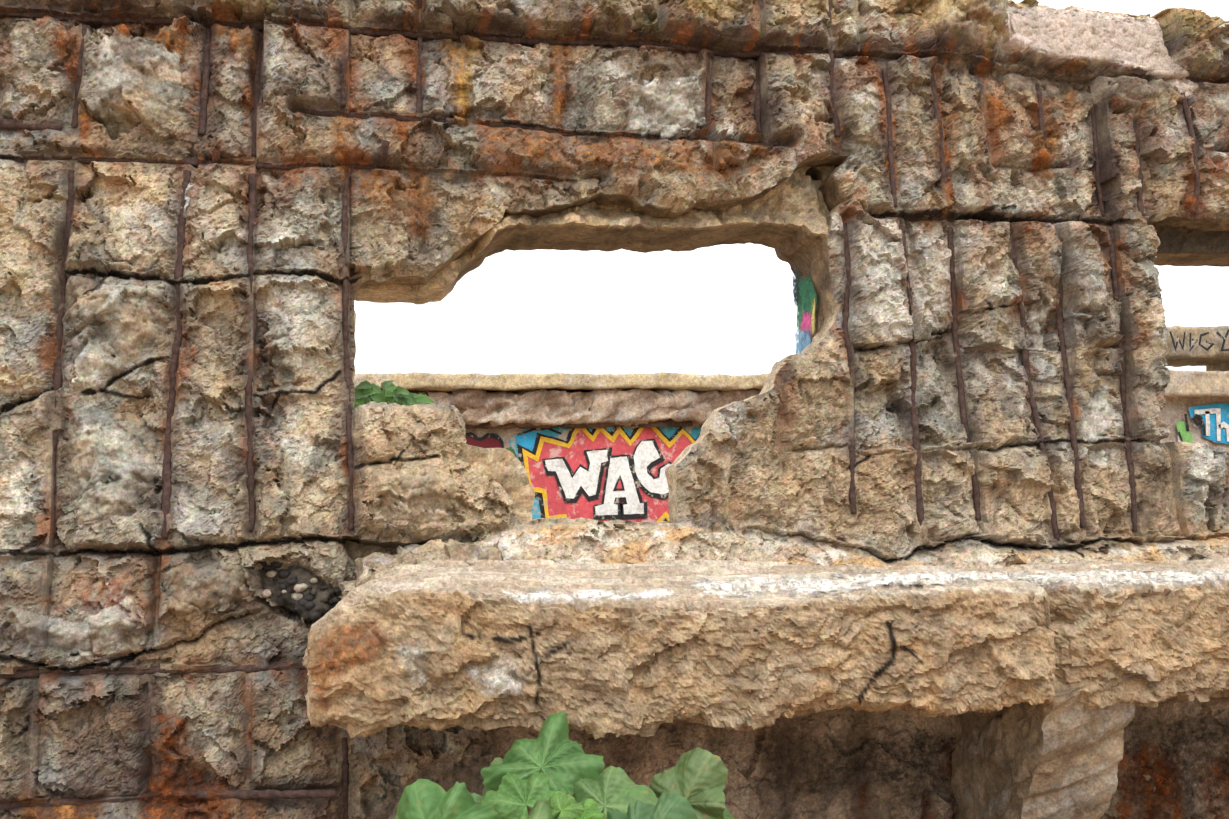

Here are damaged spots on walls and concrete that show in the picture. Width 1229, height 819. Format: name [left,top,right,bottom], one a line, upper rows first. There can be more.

rust [145,20,189,64]
rust [483,40,757,180]
spalling [874,68,897,218]
rust [1032,135,1058,179]
flaking render [899,13,1229,531]
crack [0,358,163,414]
crack [0,523,360,556]
spalling [1048,487,1060,541]
spalling [261,561,343,622]
crack [0,648,155,687]
rust [143,715,230,819]
rust [25,802,100,819]